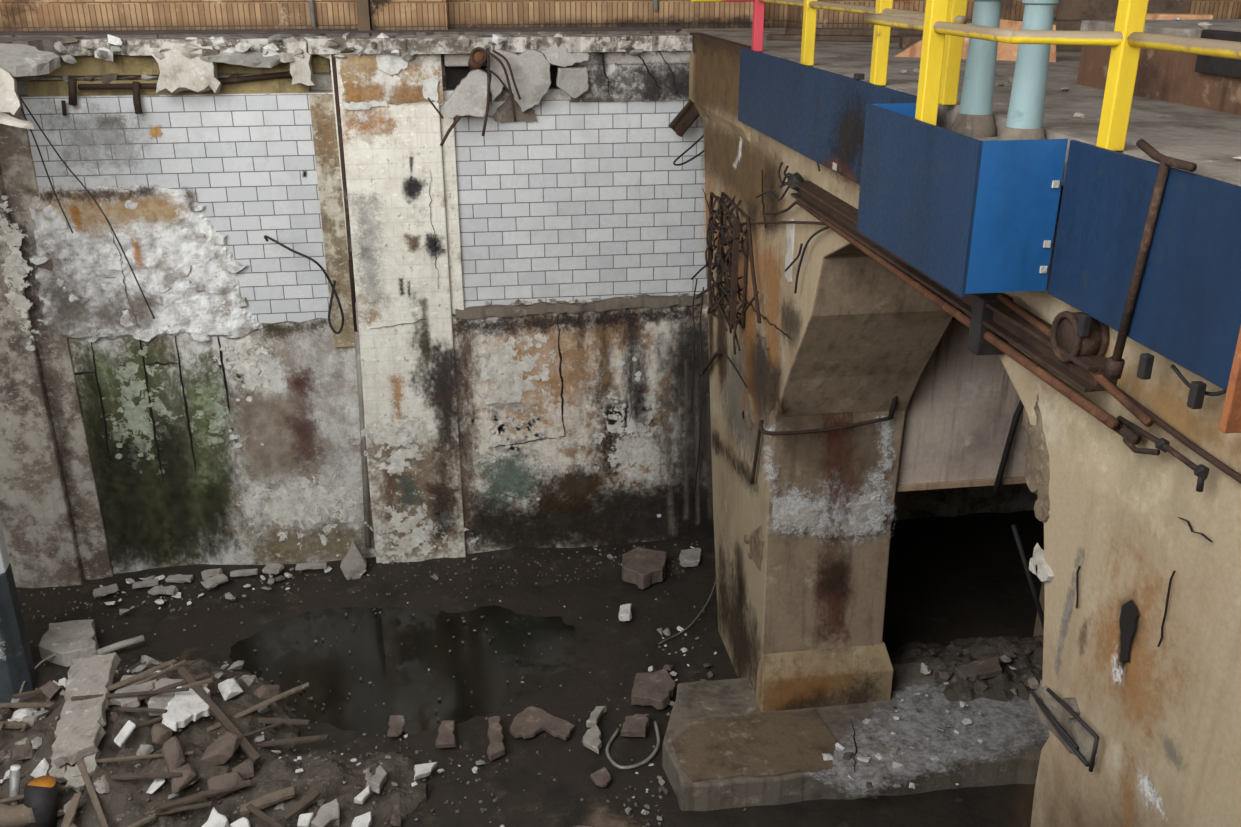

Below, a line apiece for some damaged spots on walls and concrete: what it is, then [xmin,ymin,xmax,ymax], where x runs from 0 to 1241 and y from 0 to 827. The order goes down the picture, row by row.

spalling [340,54,444,110]
spalling [492,93,538,123]
spalling [570,52,689,102]
damp [88,377,227,560]
damp [257,312,895,565]
spalling [1022,393,1050,524]
peeling [744,491,887,571]
spalling [1029,543,1055,583]
corrosion [1107,599,1148,716]